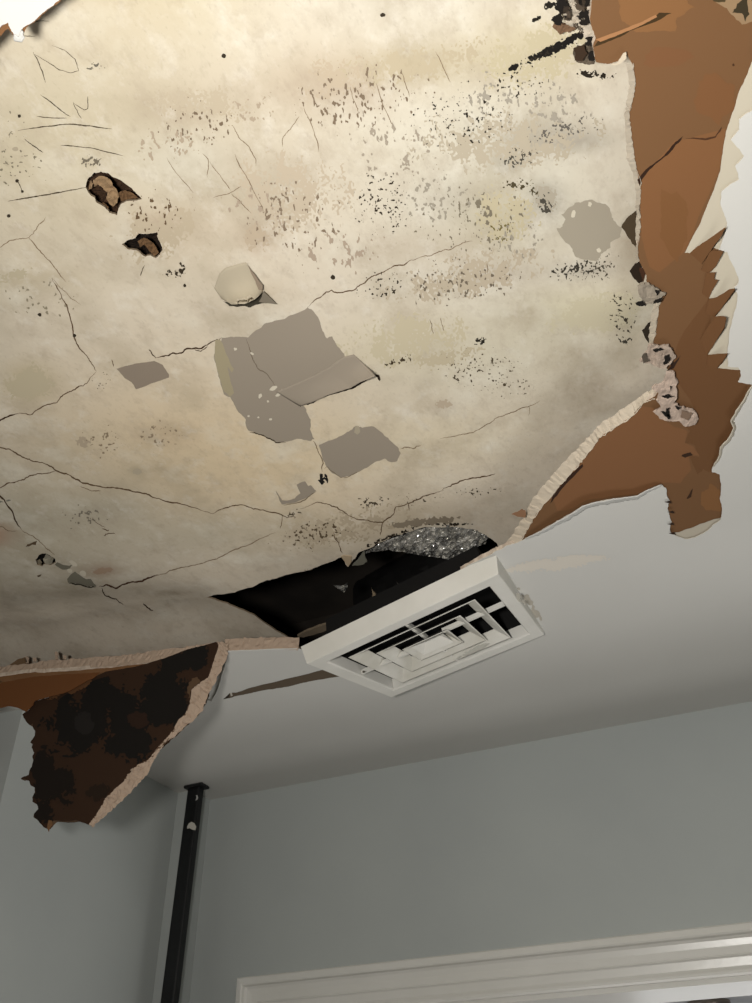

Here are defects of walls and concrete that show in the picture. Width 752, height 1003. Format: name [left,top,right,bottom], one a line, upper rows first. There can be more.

flaking render [551,0,595,65]
damp [0,111,42,193]
crack [0,219,114,421]
damp [114,189,204,287]
crack [149,339,220,358]
damp [138,78,274,164]
crack [0,447,494,611]
peeling [214,308,401,477]
crack [307,241,469,308]
damp [228,1,643,399]
spalling [507,389,662,543]
peeling [557,63,646,284]